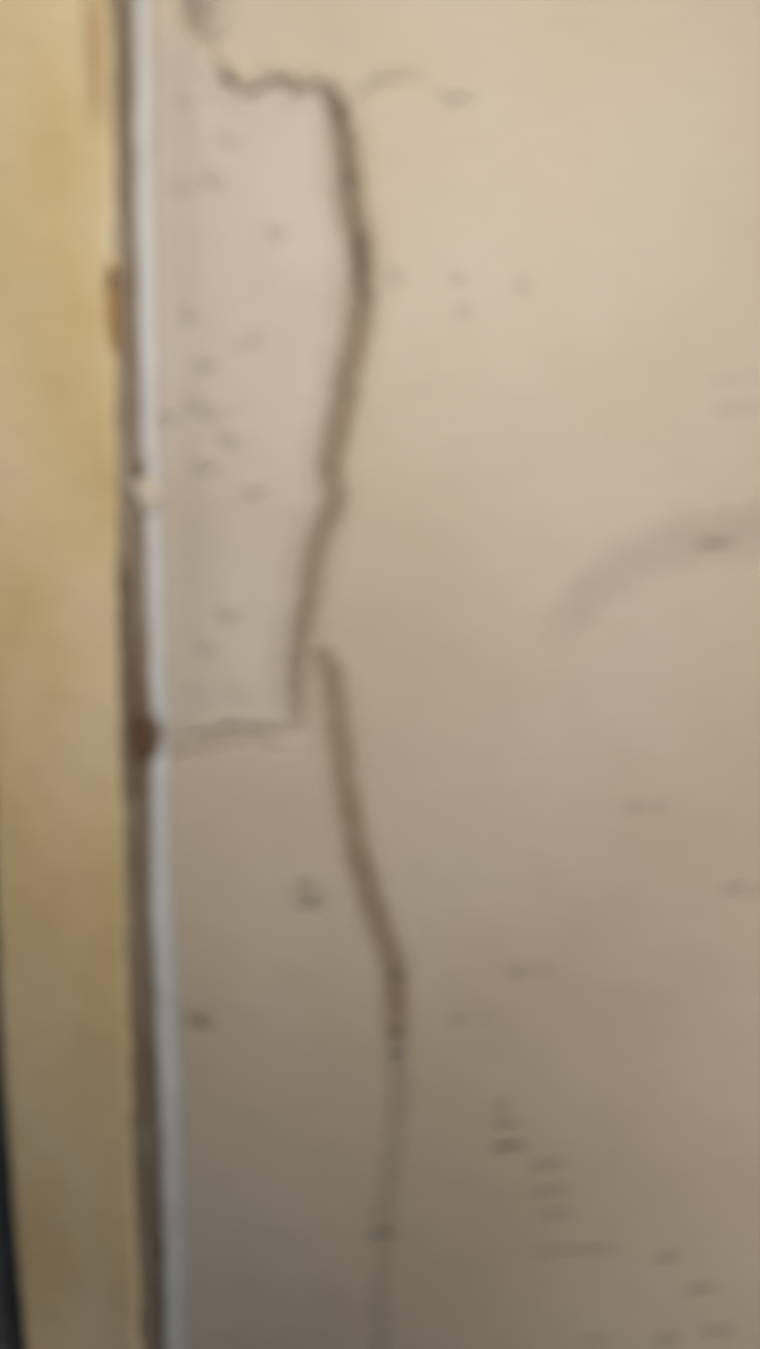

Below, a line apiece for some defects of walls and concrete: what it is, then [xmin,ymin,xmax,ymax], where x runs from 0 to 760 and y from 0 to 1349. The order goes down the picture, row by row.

crack [218,67,357,112]